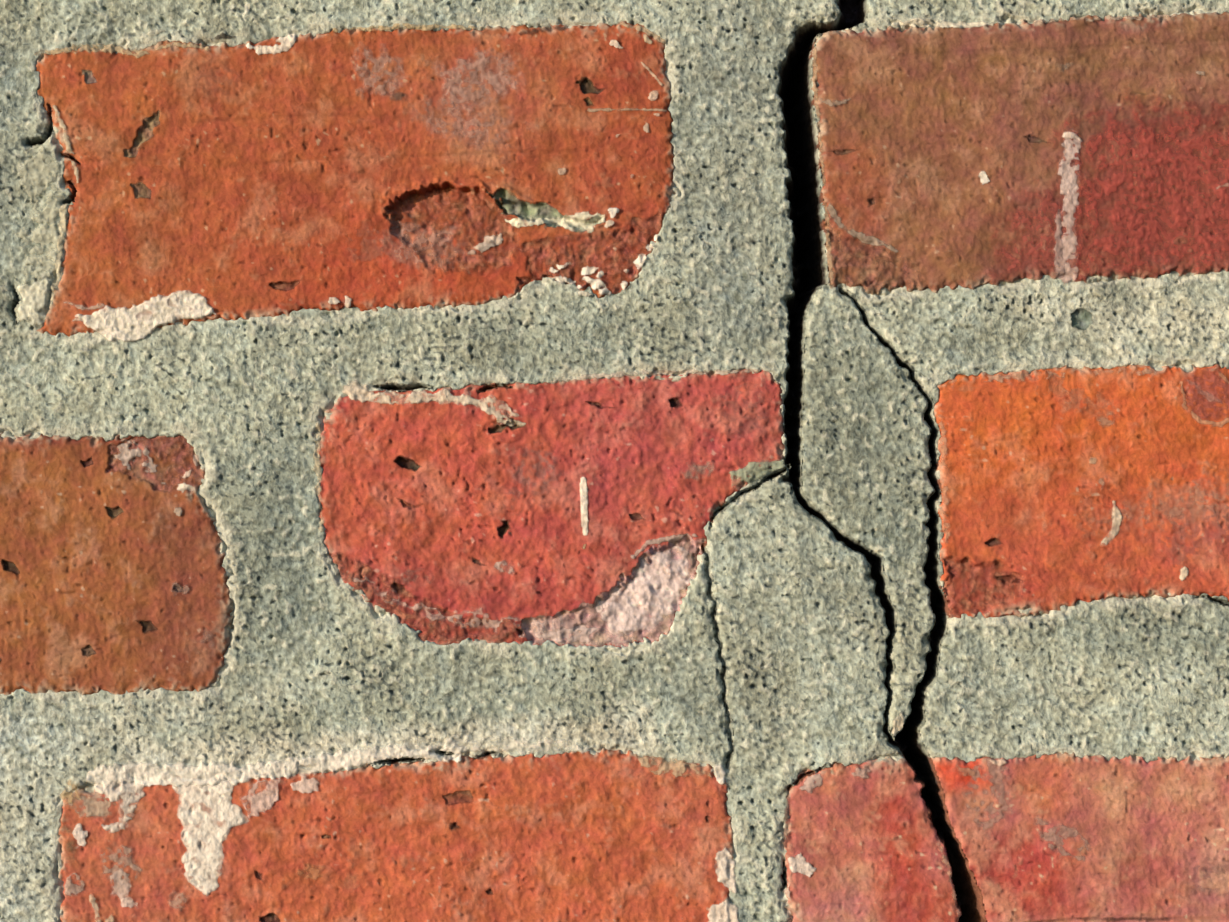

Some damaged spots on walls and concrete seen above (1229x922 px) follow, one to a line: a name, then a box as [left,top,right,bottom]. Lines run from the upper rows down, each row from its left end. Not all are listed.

spalling [386,186,662,294]
spalling [394,456,420,471]
spalling [488,418,524,434]
crack [701,0,987,922]
spalling [498,520,510,538]
spalling [329,534,707,647]